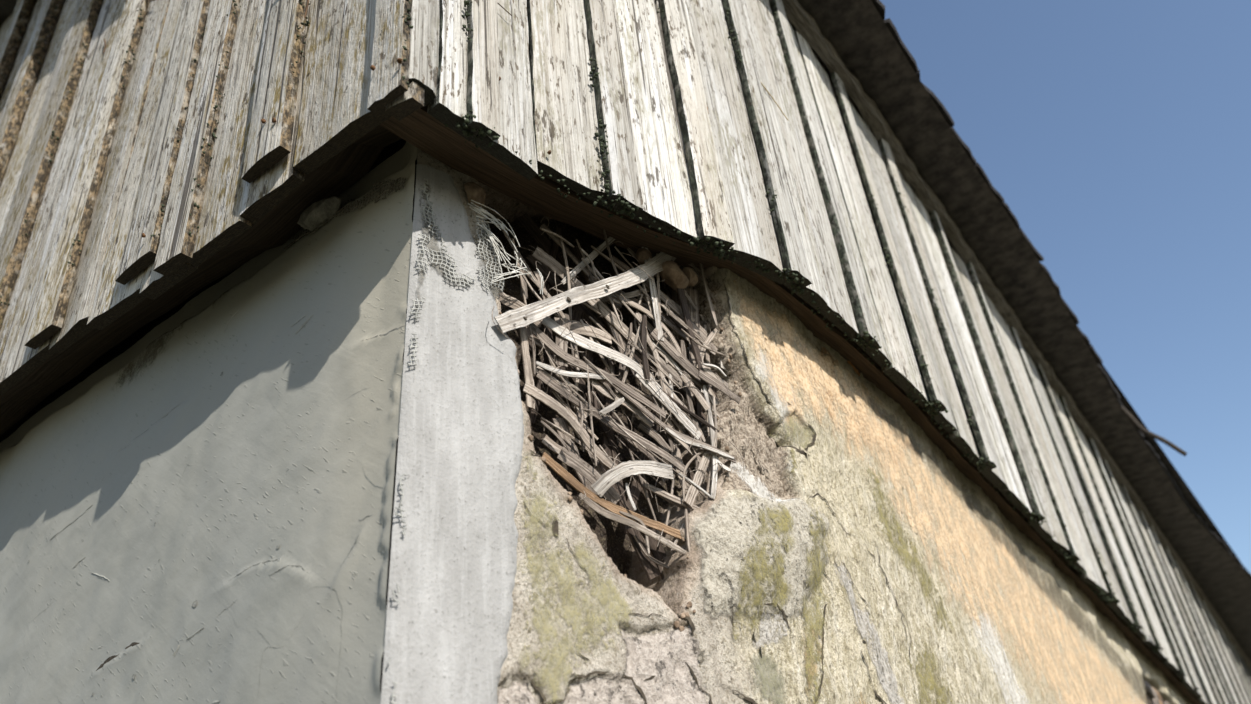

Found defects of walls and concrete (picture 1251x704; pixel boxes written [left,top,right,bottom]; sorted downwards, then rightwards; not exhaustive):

spalling [492,213,815,580]
crack [524,501,590,576]
crack [516,651,655,704]
crack [617,613,758,704]
crack [765,603,791,634]
crack [809,493,912,704]